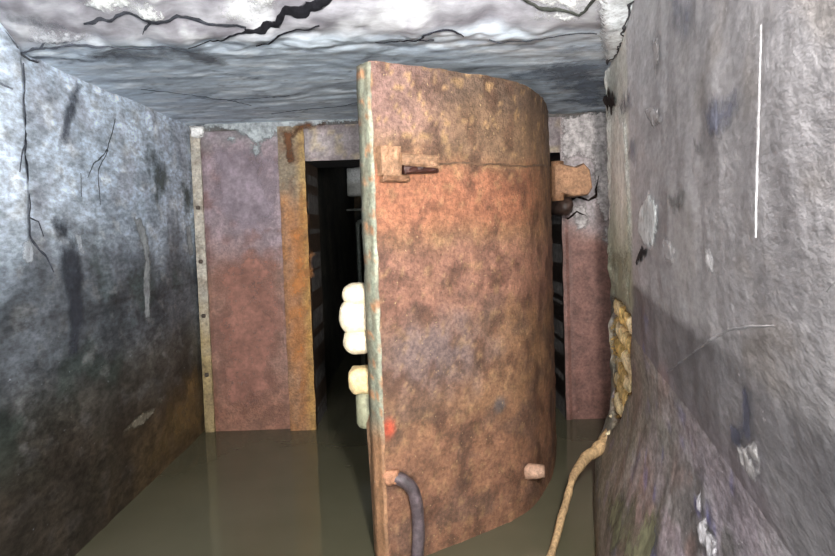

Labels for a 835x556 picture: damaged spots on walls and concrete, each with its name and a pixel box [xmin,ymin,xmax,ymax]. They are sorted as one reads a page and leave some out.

crack [375,29,464,44]
crack [489,0,597,44]
peeling [539,0,581,21]
peeling [599,0,634,62]
crack [606,1,634,65]
crack [603,89,615,115]
crack [0,0,355,272]
rust [283,122,321,164]